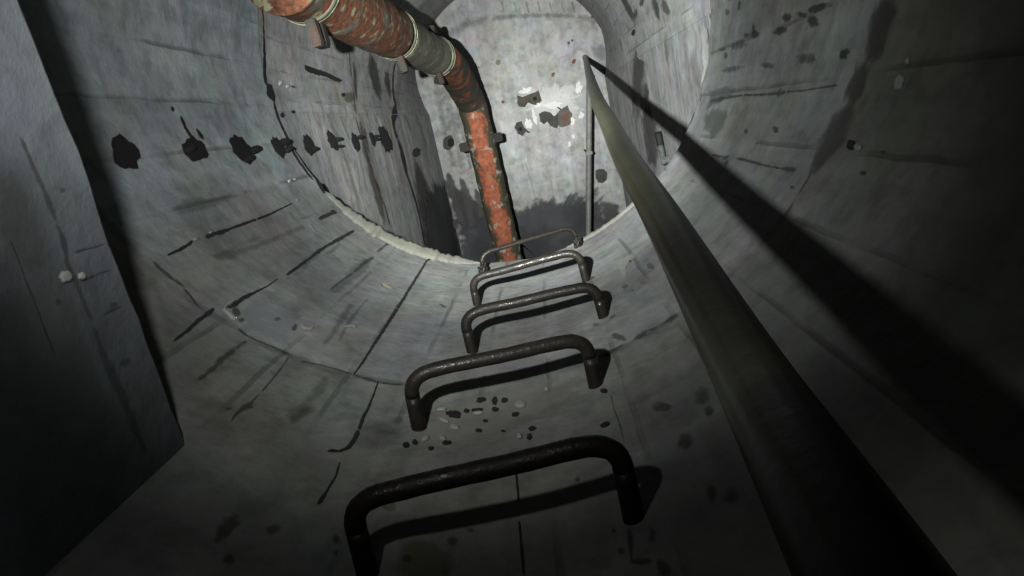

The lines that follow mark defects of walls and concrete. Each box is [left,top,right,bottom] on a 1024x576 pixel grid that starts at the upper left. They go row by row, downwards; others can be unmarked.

water stain [845,3,895,99]
crack [167,203,292,255]
crack [174,210,354,341]
crack [317,53,430,504]
water stain [415,161,496,263]
peeling [515,91,575,147]
water stain [512,81,619,259]
water stain [812,109,850,169]
crack [227,358,288,421]